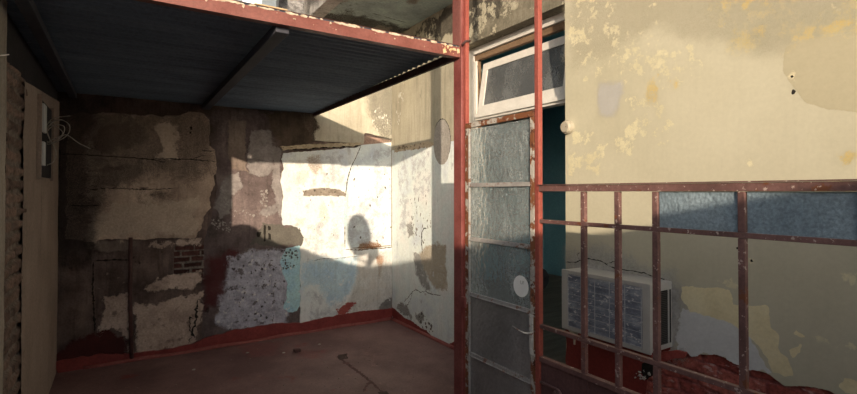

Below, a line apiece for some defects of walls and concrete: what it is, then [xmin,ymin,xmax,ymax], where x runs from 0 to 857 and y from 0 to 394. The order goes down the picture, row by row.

peeling [205,0,460,63]
peeling [469,0,519,39]
peeling [568,0,668,105]
peeling [567,118,638,176]
flaking render [174,108,434,339]
crack [568,252,664,280]
crack [188,300,198,343]
flaking render [647,278,857,394]